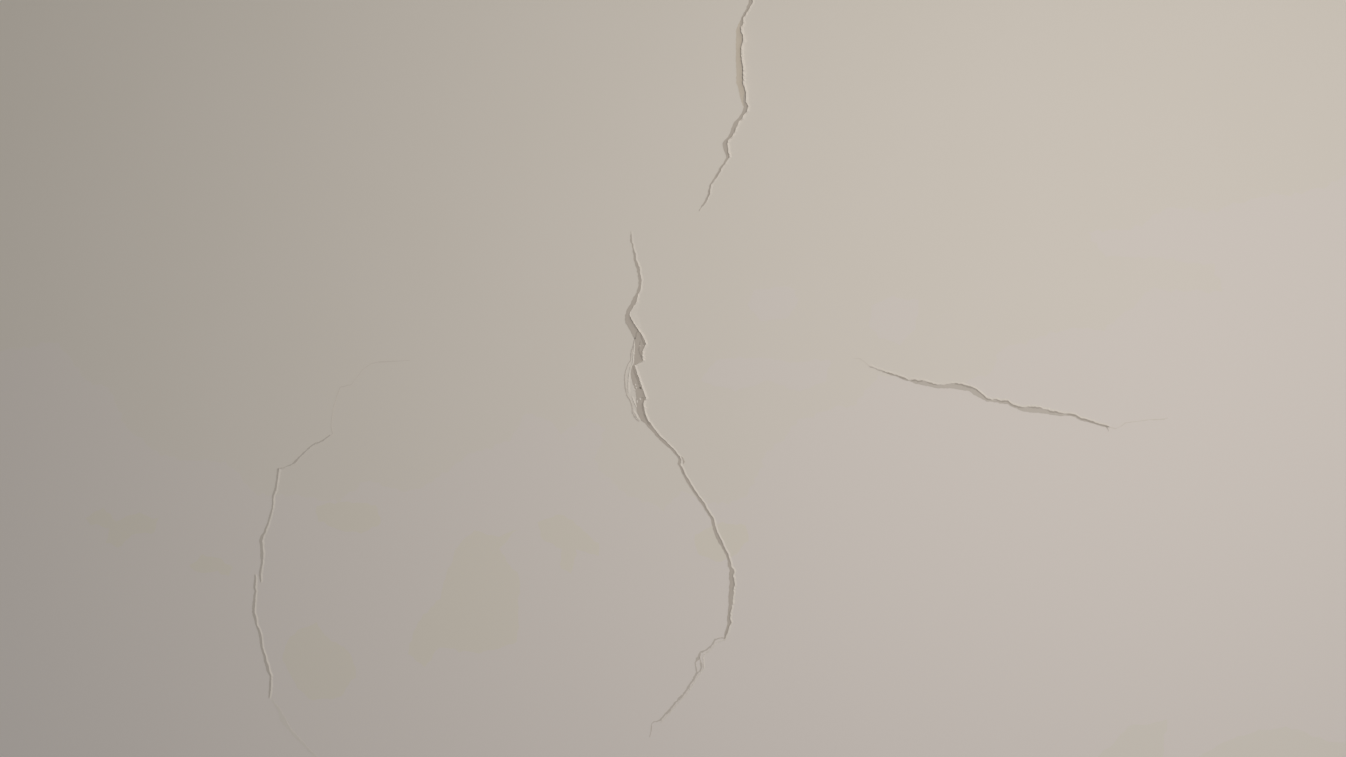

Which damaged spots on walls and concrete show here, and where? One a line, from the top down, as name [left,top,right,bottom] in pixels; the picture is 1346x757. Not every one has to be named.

crack [699,0,755,211]
crack [624,232,737,737]
crack [856,358,1167,431]